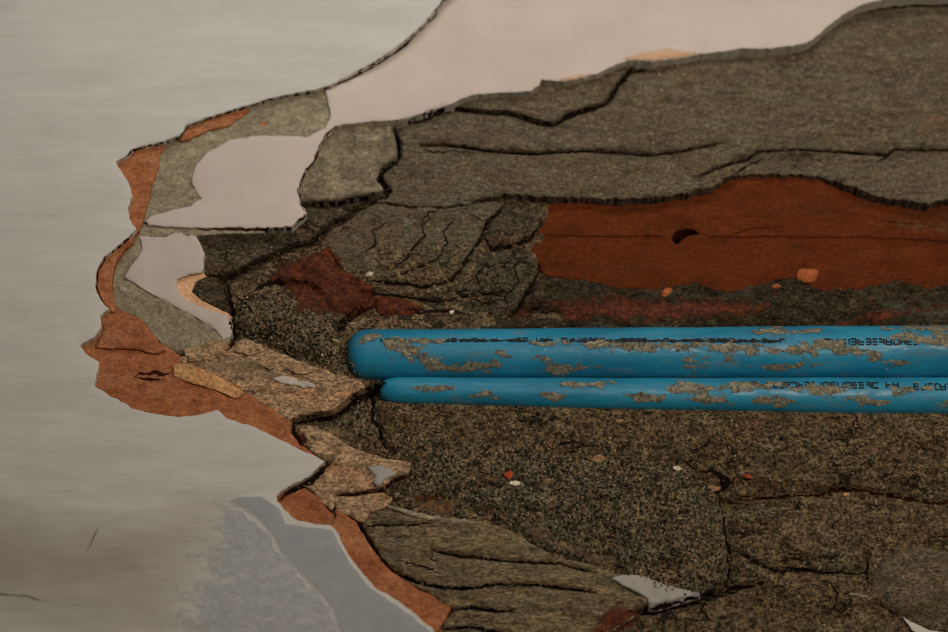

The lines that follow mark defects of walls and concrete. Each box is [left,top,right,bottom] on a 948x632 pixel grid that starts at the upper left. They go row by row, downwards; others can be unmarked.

peeling [626,49,696,62]
crack [200,67,948,350]
peeling [325,201,542,321]
spalling [797,269,819,283]
spalling [82,90,487,632]
spalling [504,471,520,486]
crack [364,521,430,529]
crack [394,551,593,632]
peeling [611,574,700,613]
peeling [902,616,939,632]